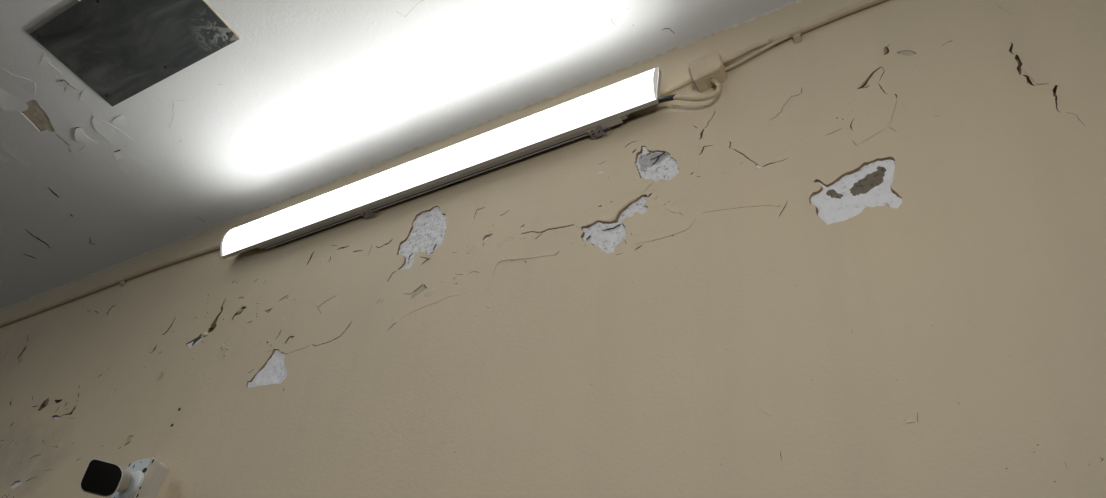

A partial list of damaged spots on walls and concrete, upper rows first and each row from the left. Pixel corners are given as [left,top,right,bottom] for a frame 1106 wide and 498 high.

crack [853,65,884,89]
crack [991,27,1104,126]
peeling [14,100,97,158]
spalling [579,146,679,253]
spalling [809,157,902,225]
spalling [375,206,447,270]
spalling [247,321,352,391]